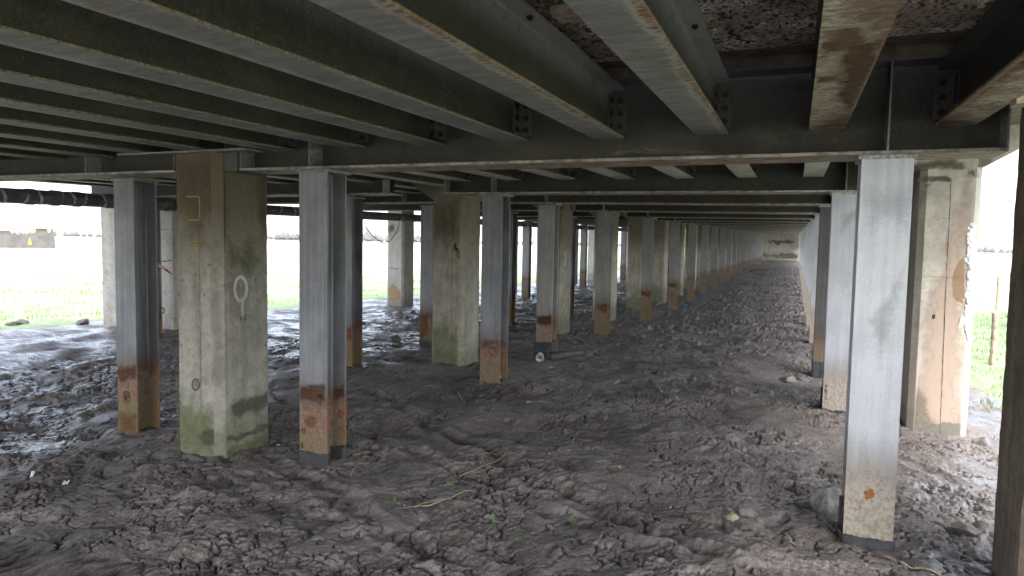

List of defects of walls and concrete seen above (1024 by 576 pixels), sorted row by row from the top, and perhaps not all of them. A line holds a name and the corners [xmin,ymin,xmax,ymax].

corrosion [817,28,880,108]
corrosion [537,315,551,325]
corrosion [118,366,136,431]
water stain [232,393,268,417]
corrosion [300,384,344,418]